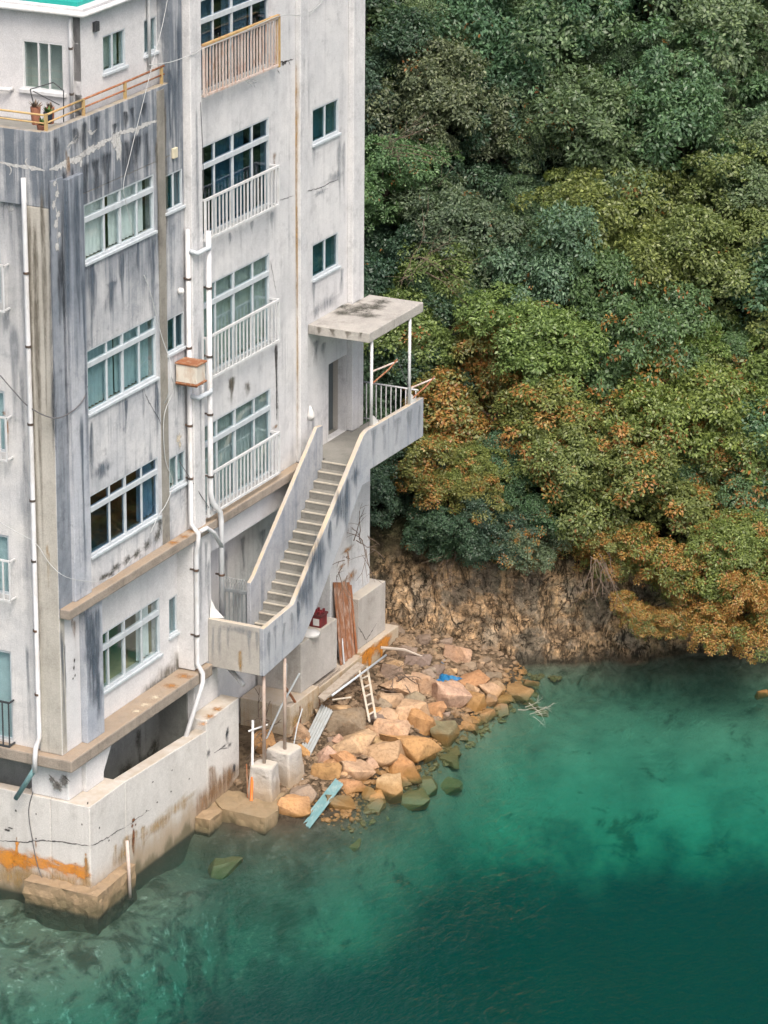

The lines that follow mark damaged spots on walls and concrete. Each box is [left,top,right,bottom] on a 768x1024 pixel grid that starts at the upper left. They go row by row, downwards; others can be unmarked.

damp [18,32,180,463]
damp [80,423,92,502]
damp [84,609,100,704]
rust [333,582,390,666]
rust [0,838,89,885]
crack [0,810,150,846]
rust [200,768,235,811]